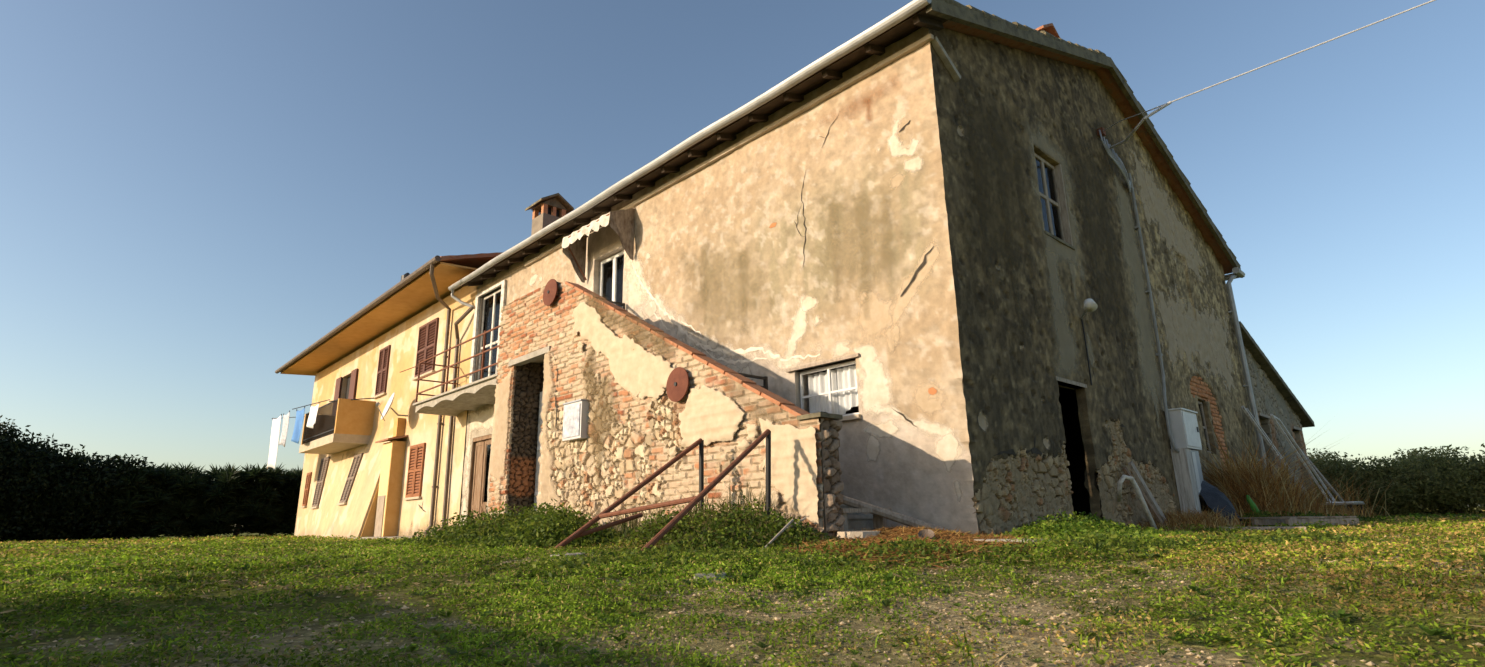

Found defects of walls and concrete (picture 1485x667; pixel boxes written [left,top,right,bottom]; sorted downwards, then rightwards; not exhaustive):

crack [794,114,839,265]
peeling [878,120,922,188]
peeling [536,353,579,513]
peeling [571,301,674,399]
spalling [625,243,1074,535]